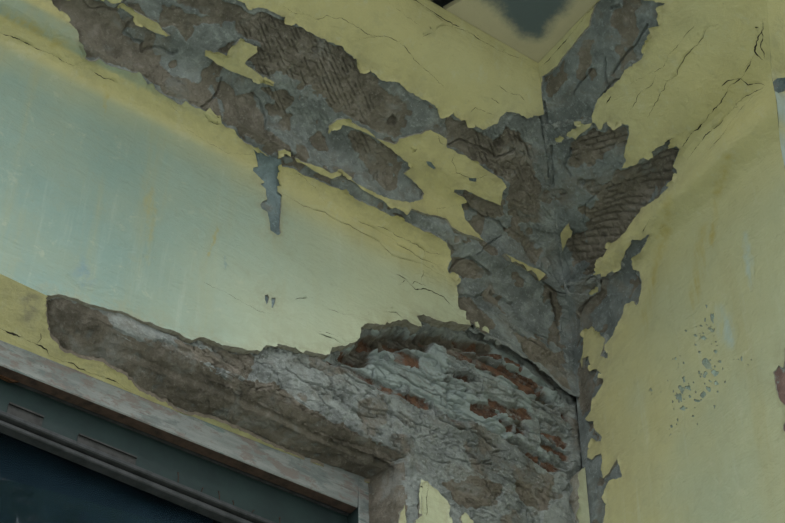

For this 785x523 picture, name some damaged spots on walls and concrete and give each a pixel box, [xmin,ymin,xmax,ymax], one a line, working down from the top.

crack [629,19,719,117]
crack [679,17,767,158]
flaking render [47,0,665,523]
crack [396,271,455,306]
crack [2,329,128,390]
peeling [673,305,726,425]
peeling [775,366,785,404]